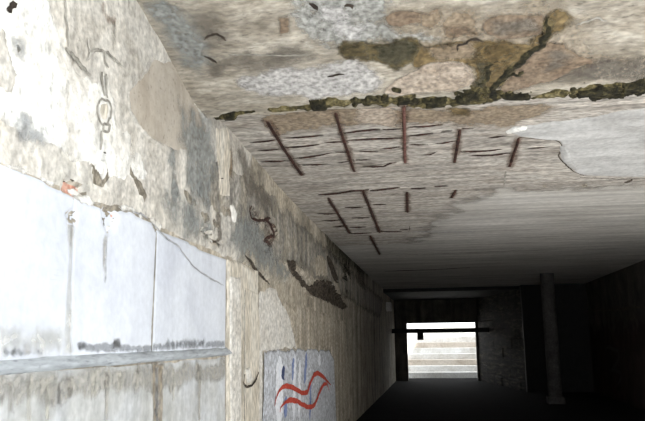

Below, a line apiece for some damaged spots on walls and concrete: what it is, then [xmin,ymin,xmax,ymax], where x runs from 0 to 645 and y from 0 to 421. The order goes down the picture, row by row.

flaking render [128,58,206,150]
leakage [211,0,554,99]
leakage [262,104,552,135]
crack [456,38,482,52]
crack [478,17,552,104]
flaking render [506,108,645,183]
crack [133,211,222,347]
spalling [287,255,348,310]